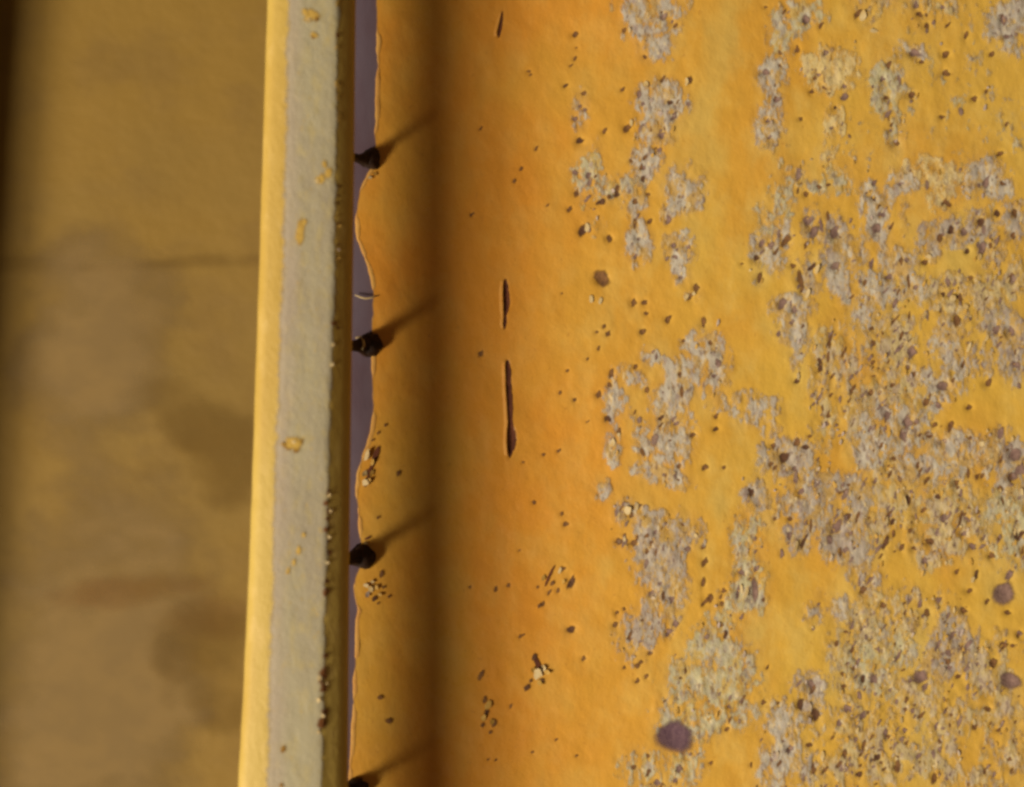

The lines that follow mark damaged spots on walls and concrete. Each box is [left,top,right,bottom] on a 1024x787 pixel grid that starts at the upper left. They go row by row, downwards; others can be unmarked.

flaking render [315,0,387,552]
crack [499,279,510,330]
crack [501,360,516,458]
peeling [567,76,706,301]
peeling [595,0,1024,787]
flaking render [348,565,391,773]
peeling [523,654,550,691]
peeling [536,565,575,608]